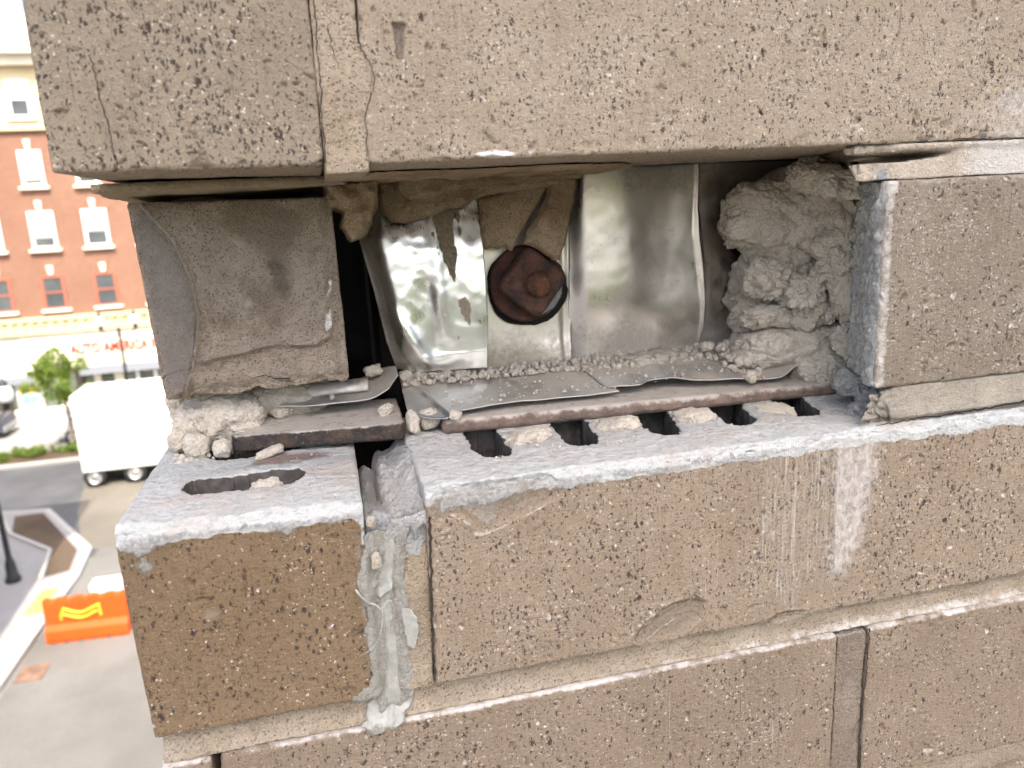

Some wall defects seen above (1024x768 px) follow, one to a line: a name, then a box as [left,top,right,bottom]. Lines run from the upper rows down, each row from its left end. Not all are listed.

crack [89,55,118,165]
crack [313,0,339,163]
crack [354,0,375,159]
peeling [542,287,563,314]
leakage [819,441,874,569]
crack [428,517,437,680]